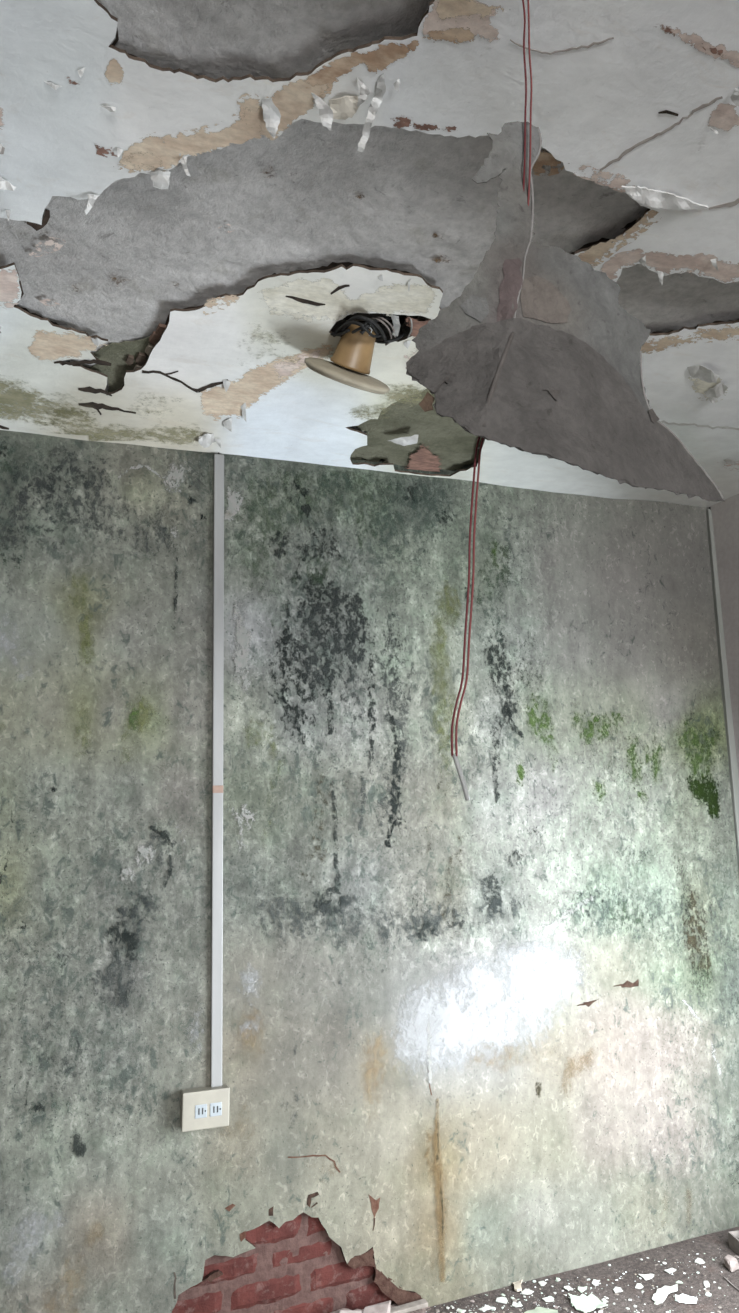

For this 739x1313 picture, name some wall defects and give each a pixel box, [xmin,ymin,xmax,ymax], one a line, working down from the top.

peeling [654,24,739,68]
peeling [708,87,739,134]
spalling [0,0,506,393]
spalling [529,127,739,500]
peeling [199,345,334,448]
spalling [350,389,485,472]